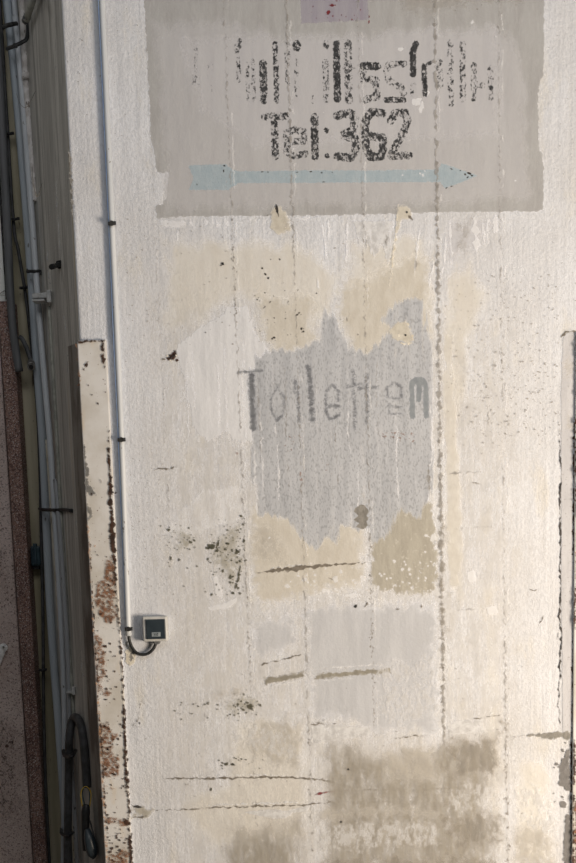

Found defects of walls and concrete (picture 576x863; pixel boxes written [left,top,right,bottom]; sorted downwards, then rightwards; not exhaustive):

peeling [144,0,545,251]
flaking render [255,282,317,352]
flaking render [337,258,446,355]
corrosion [83,430,133,863]
flaking render [242,502,445,739]